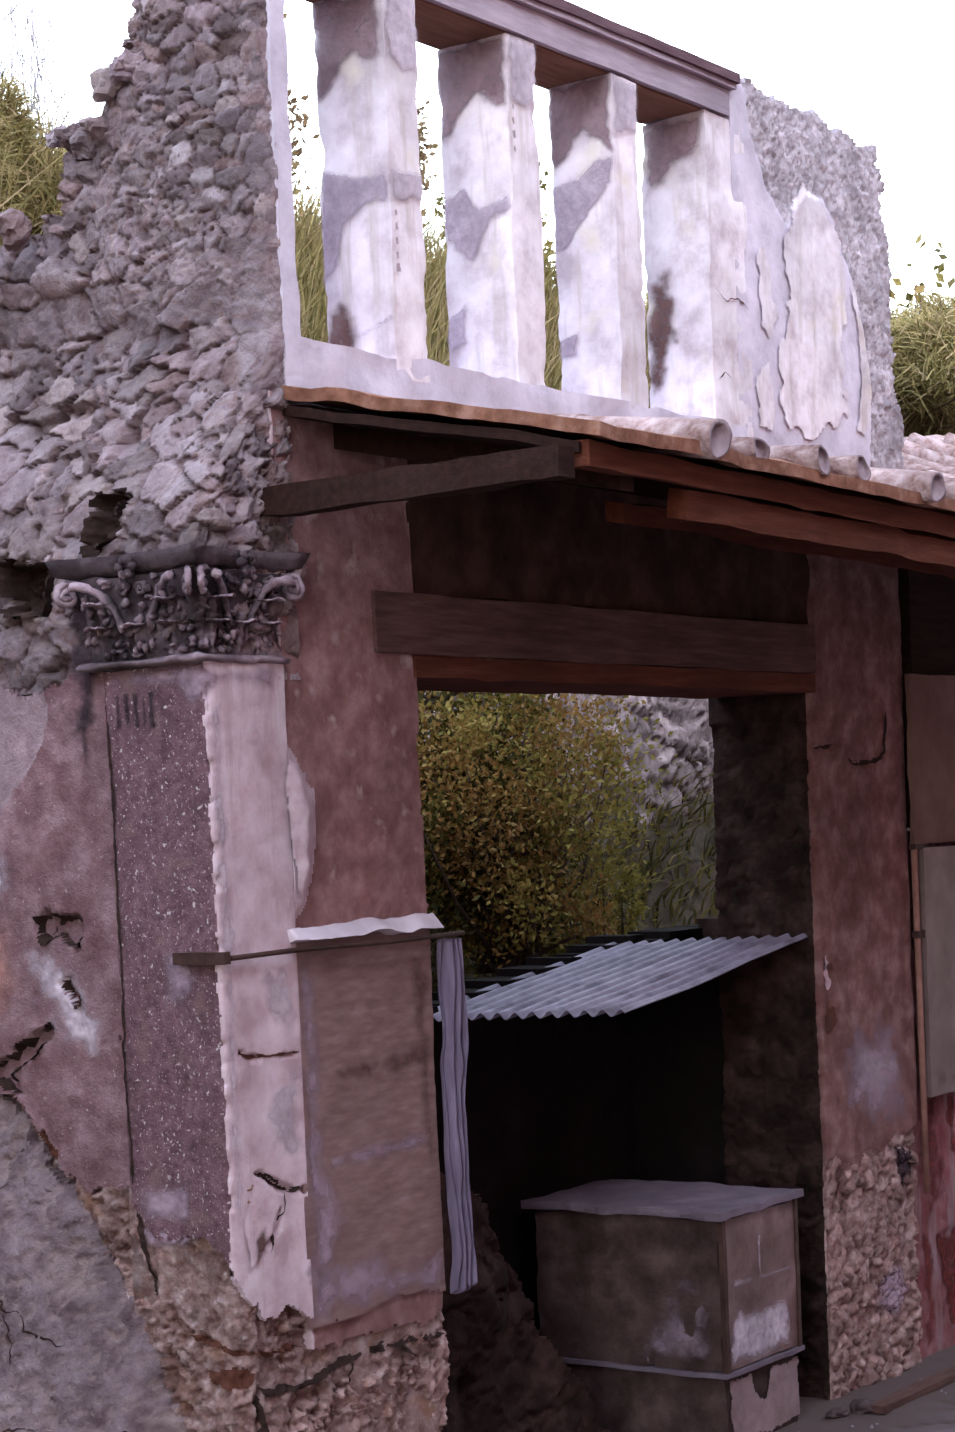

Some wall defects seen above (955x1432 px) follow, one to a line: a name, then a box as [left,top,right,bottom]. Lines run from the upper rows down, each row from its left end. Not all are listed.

spalling [32,913,84,948]
spalling [61,980,82,1009]
spalling [0,1022,55,1093]
spalling [33,1126,59,1160]
spalling [895,1144,916,1185]
spalling [836,1169,851,1213]
peeling [145,1189,188,1245]
crack [243,1172,301,1267]
spalling [878,1269,907,1312]
crack [0,1300,64,1367]
spalling [209,1367,255,1392]
spalling [309,1342,447,1432]